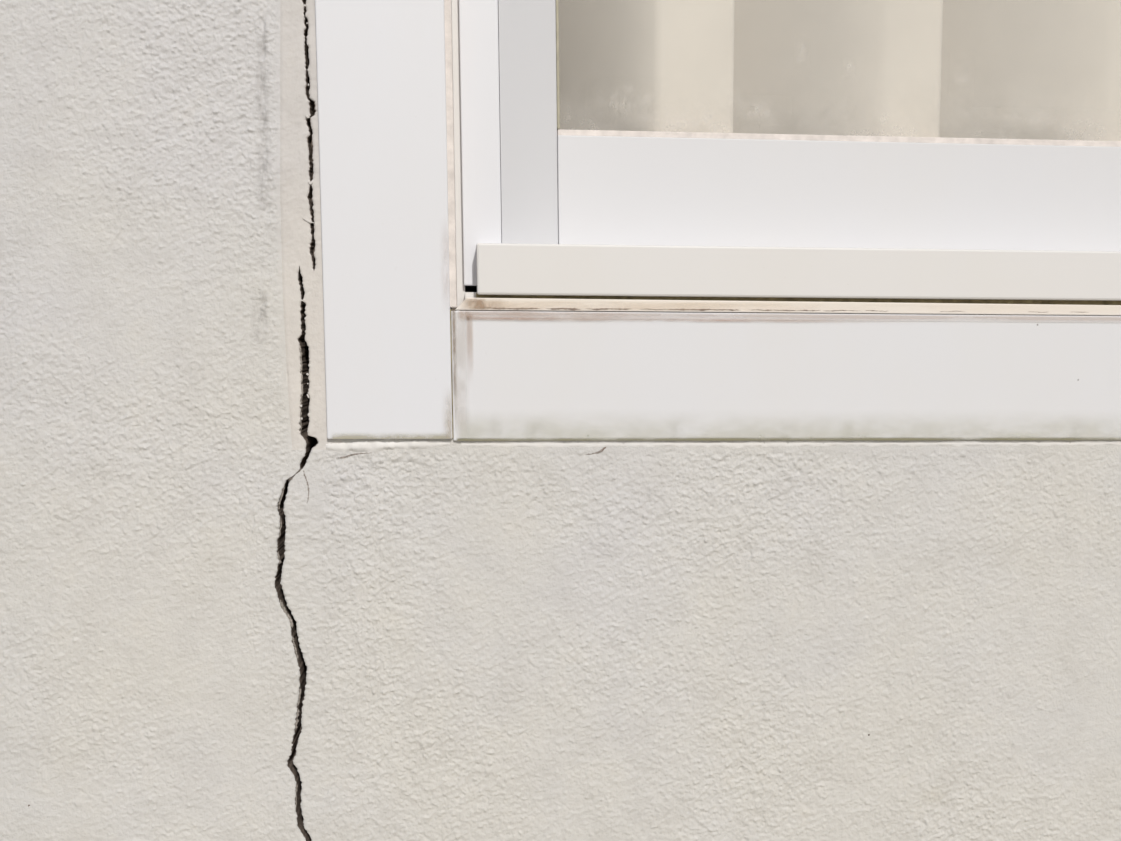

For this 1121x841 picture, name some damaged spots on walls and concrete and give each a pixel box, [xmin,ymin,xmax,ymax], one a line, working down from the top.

crack [275,0,318,841]